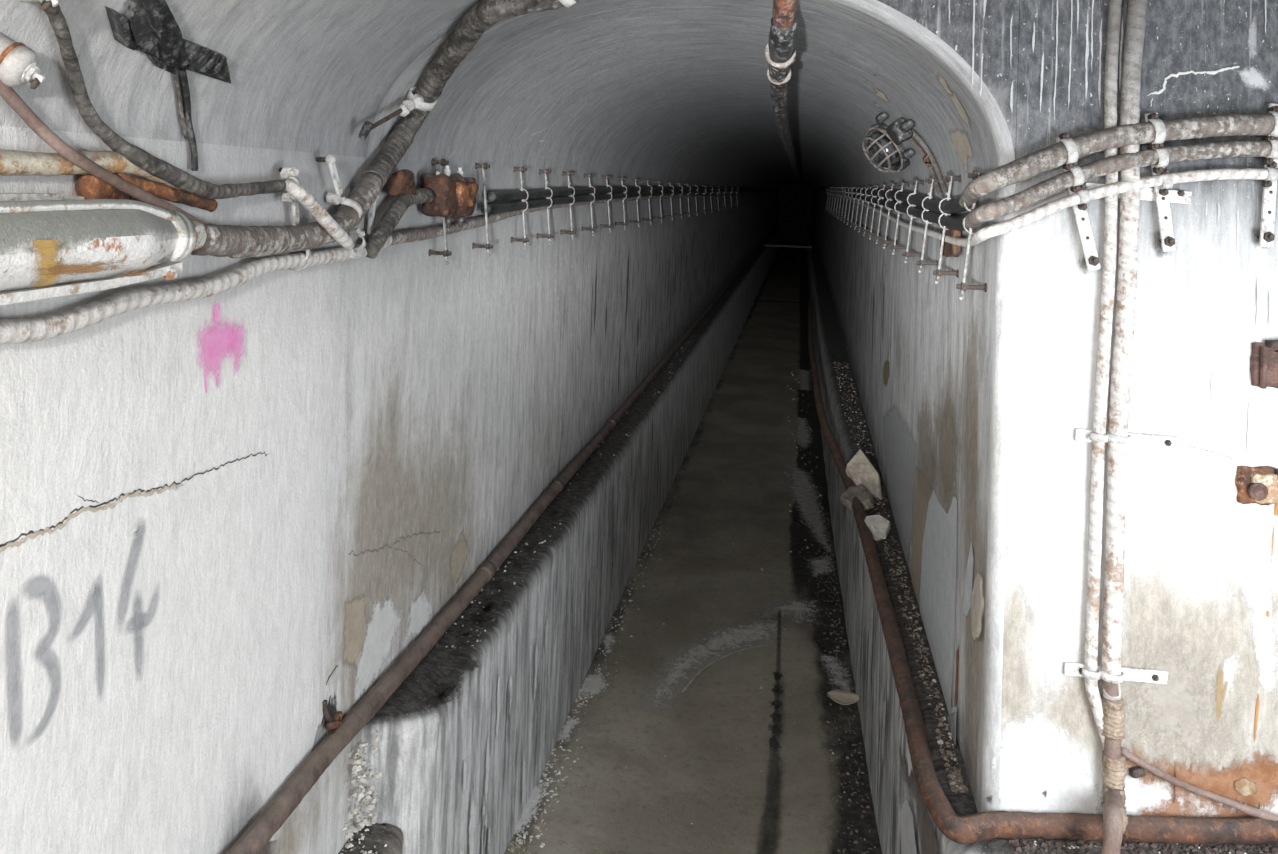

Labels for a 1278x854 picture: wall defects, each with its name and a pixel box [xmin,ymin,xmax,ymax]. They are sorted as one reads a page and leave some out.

crack [0,452,269,553]
water stain [918,403,958,498]
peeling [311,591,432,753]
water stain [788,416,939,854]
peeling [883,406,974,745]
water stain [1123,640,1239,770]
rust [1125,695,1278,818]
rust [1216,669,1227,717]
peeling [1222,655,1238,709]
peeling [1231,508,1278,691]